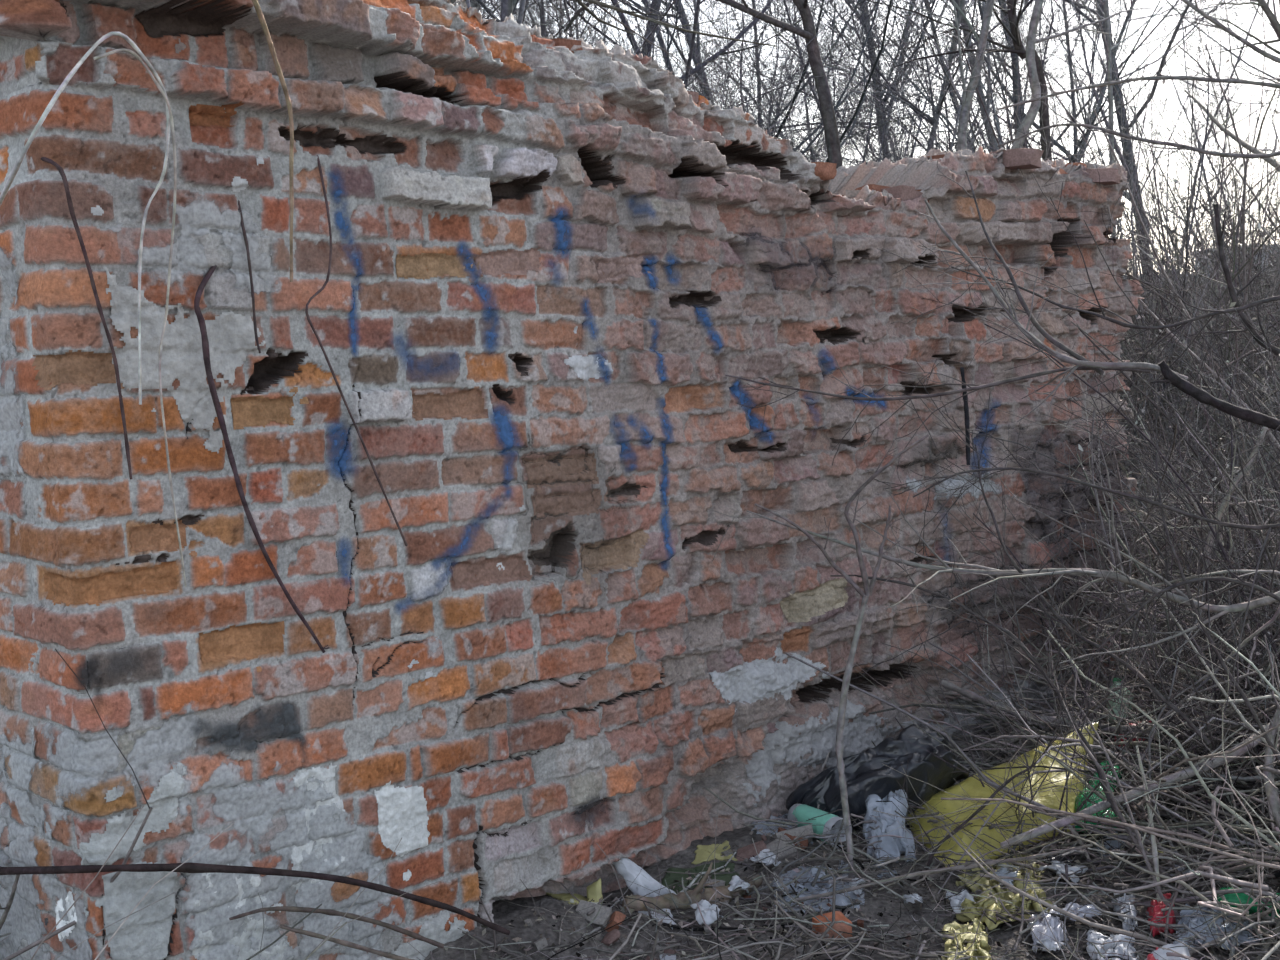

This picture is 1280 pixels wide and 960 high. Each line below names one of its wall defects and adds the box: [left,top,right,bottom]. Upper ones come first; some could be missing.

spalling [374,72,470,111]
spalling [278,126,407,154]
spalling [490,169,550,204]
spalling [577,145,626,188]
spalling [668,139,929,208]
spalling [813,326,870,345]
spalling [230,331,309,430]
crack [341,384,424,706]
spalling [449,452,650,588]
spalling [796,664,919,703]
crack [454,666,665,773]
crack [472,822,527,917]